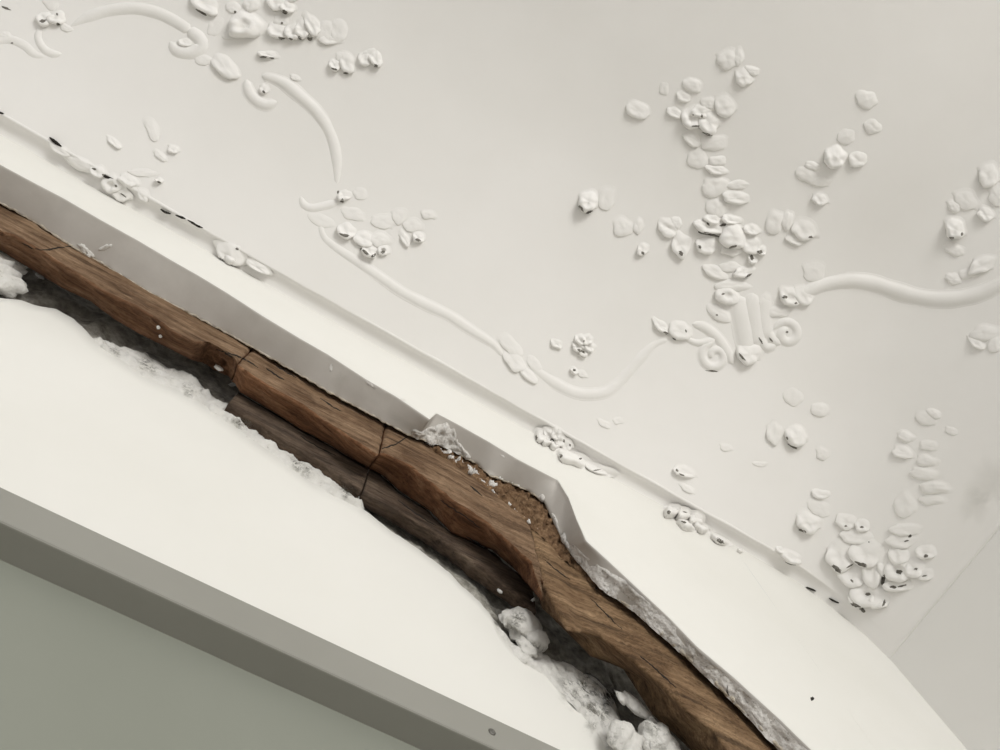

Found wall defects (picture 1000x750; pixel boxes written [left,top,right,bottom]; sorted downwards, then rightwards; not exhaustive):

flaking render [0,202,807,750]